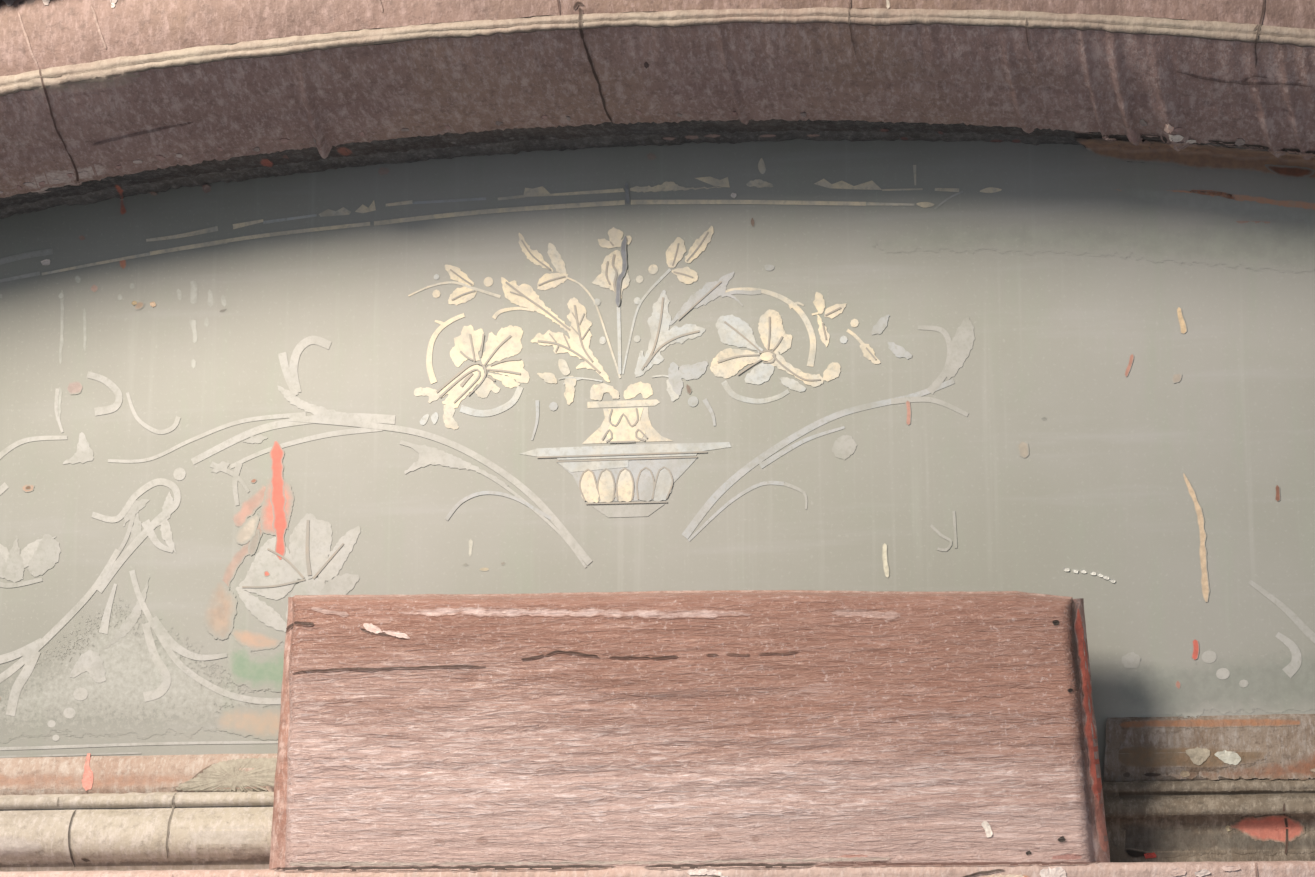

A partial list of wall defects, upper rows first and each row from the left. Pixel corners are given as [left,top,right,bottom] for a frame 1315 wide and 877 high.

crack [557,0,614,124]
crack [848,0,856,56]
crack [1177,0,1311,87]
crack [18,12,191,185]
spalling [1074,119,1315,154]
crack [292,664,486,674]
crack [521,650,797,661]
peeling [1070,597,1108,852]
crack [56,797,76,867]
peeling [981,821,993,838]
peeling [1225,815,1305,845]
peeling [962,853,1082,877]